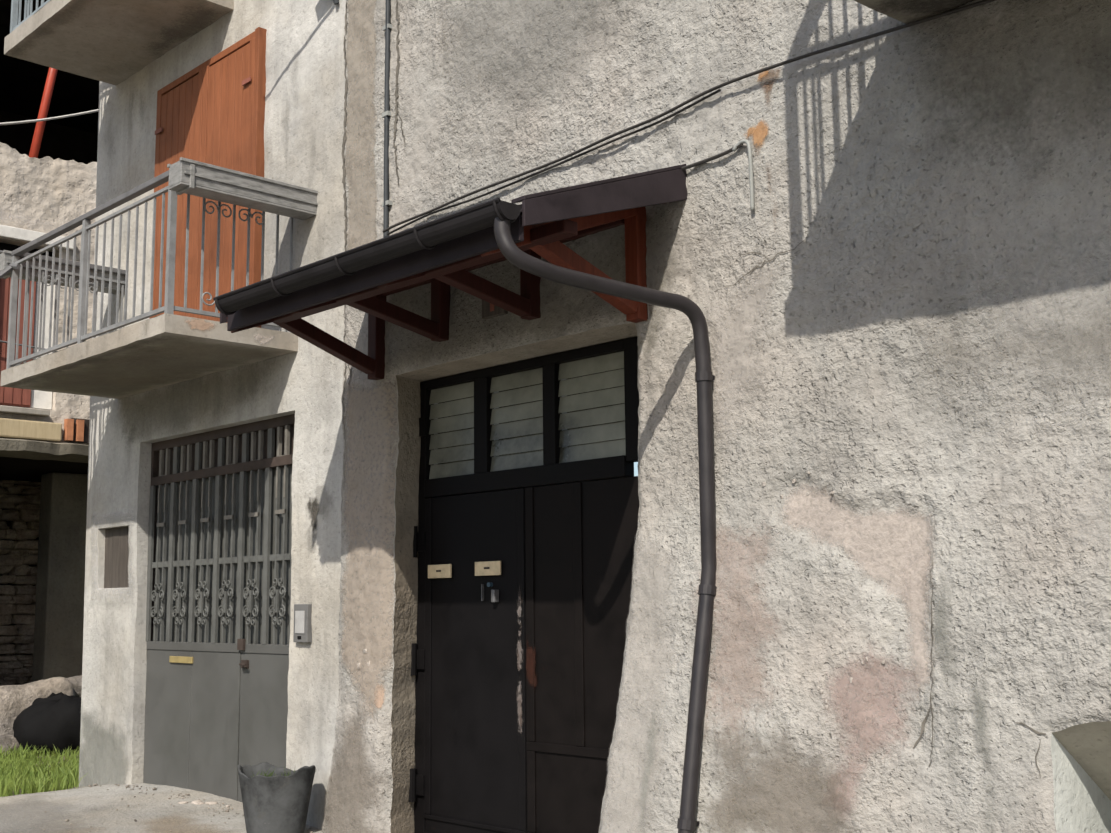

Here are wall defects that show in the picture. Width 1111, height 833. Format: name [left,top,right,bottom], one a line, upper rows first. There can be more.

rust [747,121,768,144]
crack [725,240,804,287]
crack [913,562,934,766]